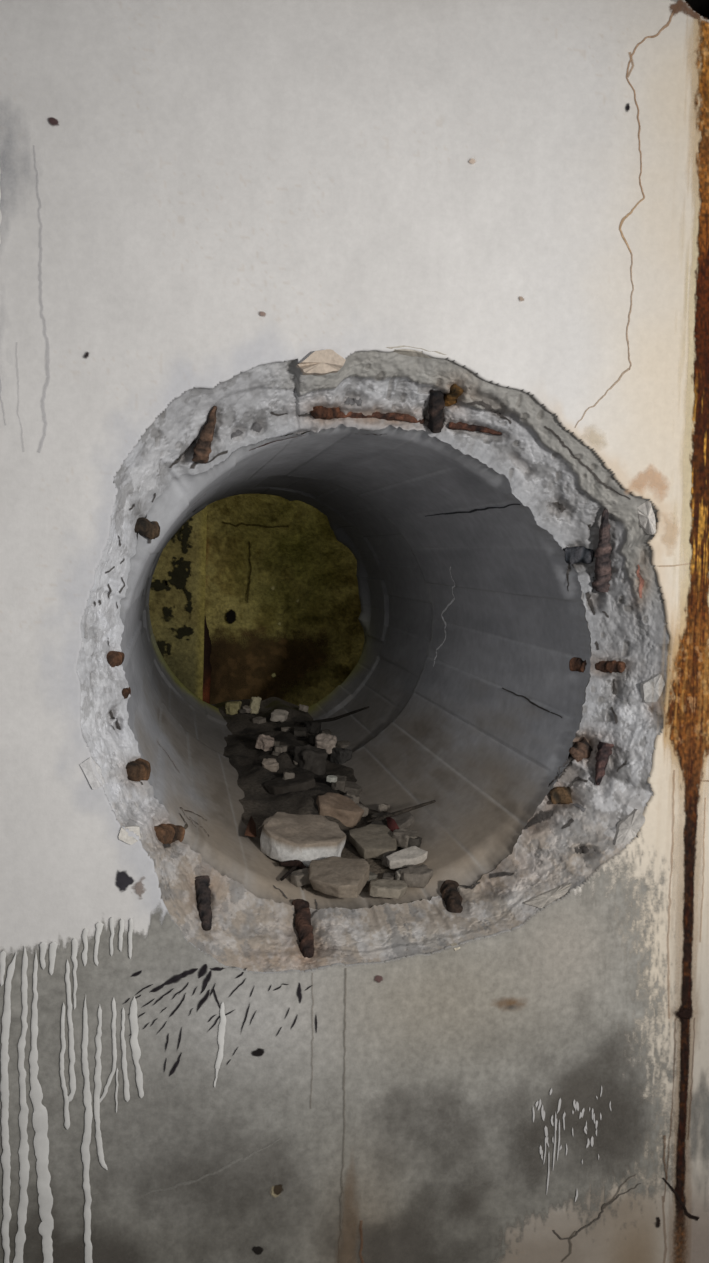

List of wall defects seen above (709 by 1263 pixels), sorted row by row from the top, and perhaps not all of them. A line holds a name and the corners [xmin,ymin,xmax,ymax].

flaking render [670,0,707,19]
crack [575,12,674,428]
peeling [0,345,680,1263]
rust [664,18,709,1263]
water stain [0,917,144,1263]
water stain [214,1002,226,1088]
water stain [533,1086,611,1191]